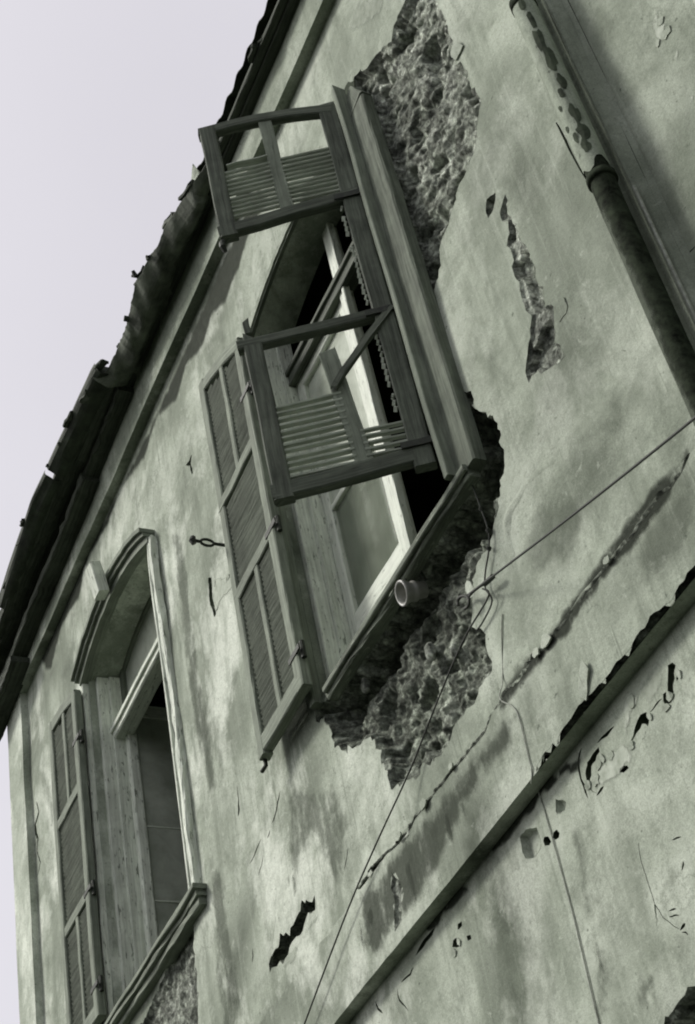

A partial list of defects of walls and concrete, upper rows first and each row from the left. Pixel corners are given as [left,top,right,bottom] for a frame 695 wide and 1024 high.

peeling [653,11,671,47]
flaking render [344,0,481,297]
flaking render [486,193,568,383]
spalling [269,895,317,971]
flaking render [314,391,505,790]
flaking render [520,828,542,859]
damp [501,477,672,707]
crack [578,726,614,798]
flaking render [536,566,695,787]
crack [638,843,688,935]